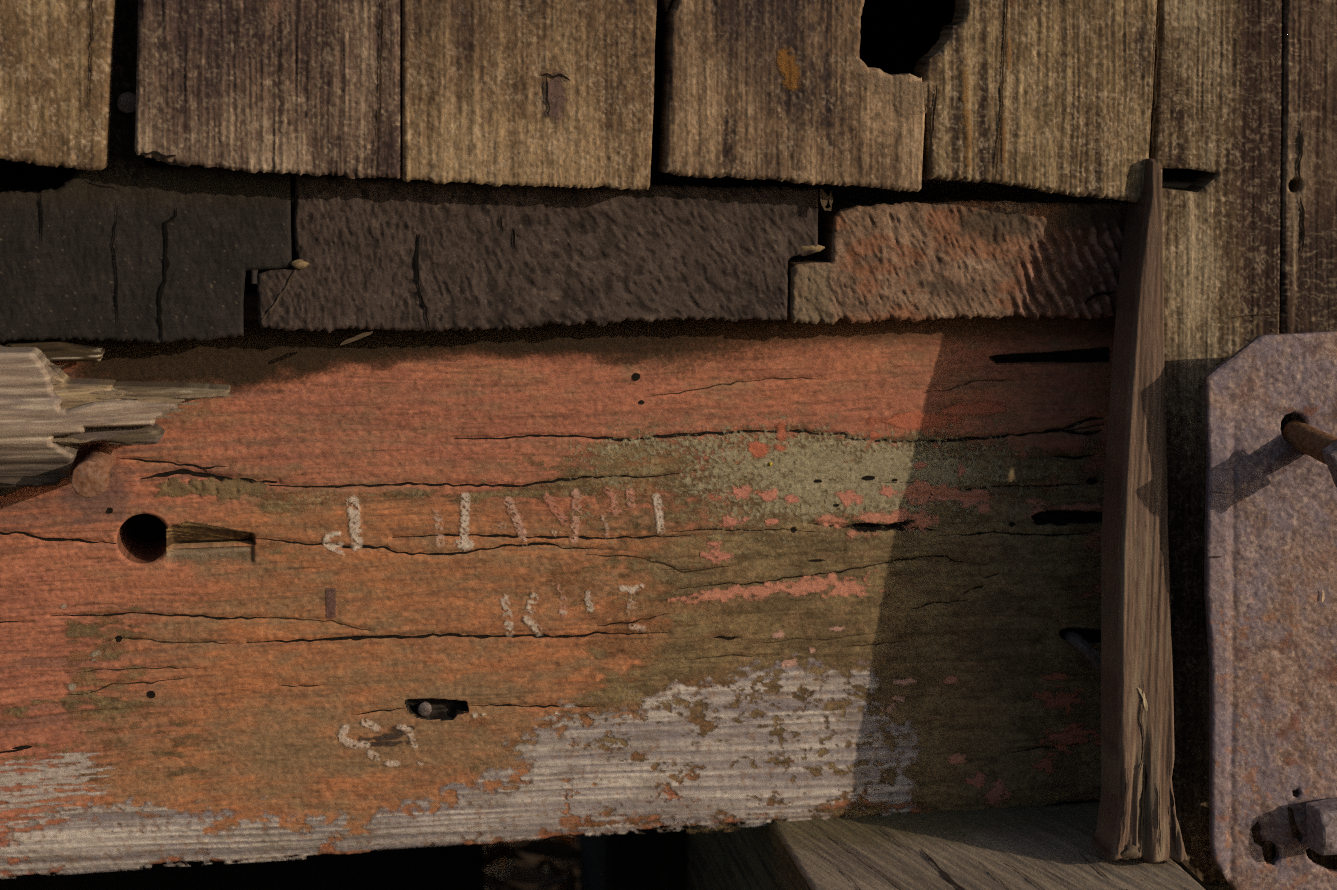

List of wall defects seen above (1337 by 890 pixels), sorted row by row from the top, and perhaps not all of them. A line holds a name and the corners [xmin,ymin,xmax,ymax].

crack [111,206,119,323]
crack [158,208,177,344]
crack [121,458,741,488]
peeling [700,486,799,564]
peeling [747,423,787,457]
crack [454,417,1104,490]
peeling [815,462,993,538]
crack [53,523,1092,695]
peeling [668,570,885,604]
peeling [0,647,923,878]
peeling [948,753,1011,808]
crack [879,825,1045,890]